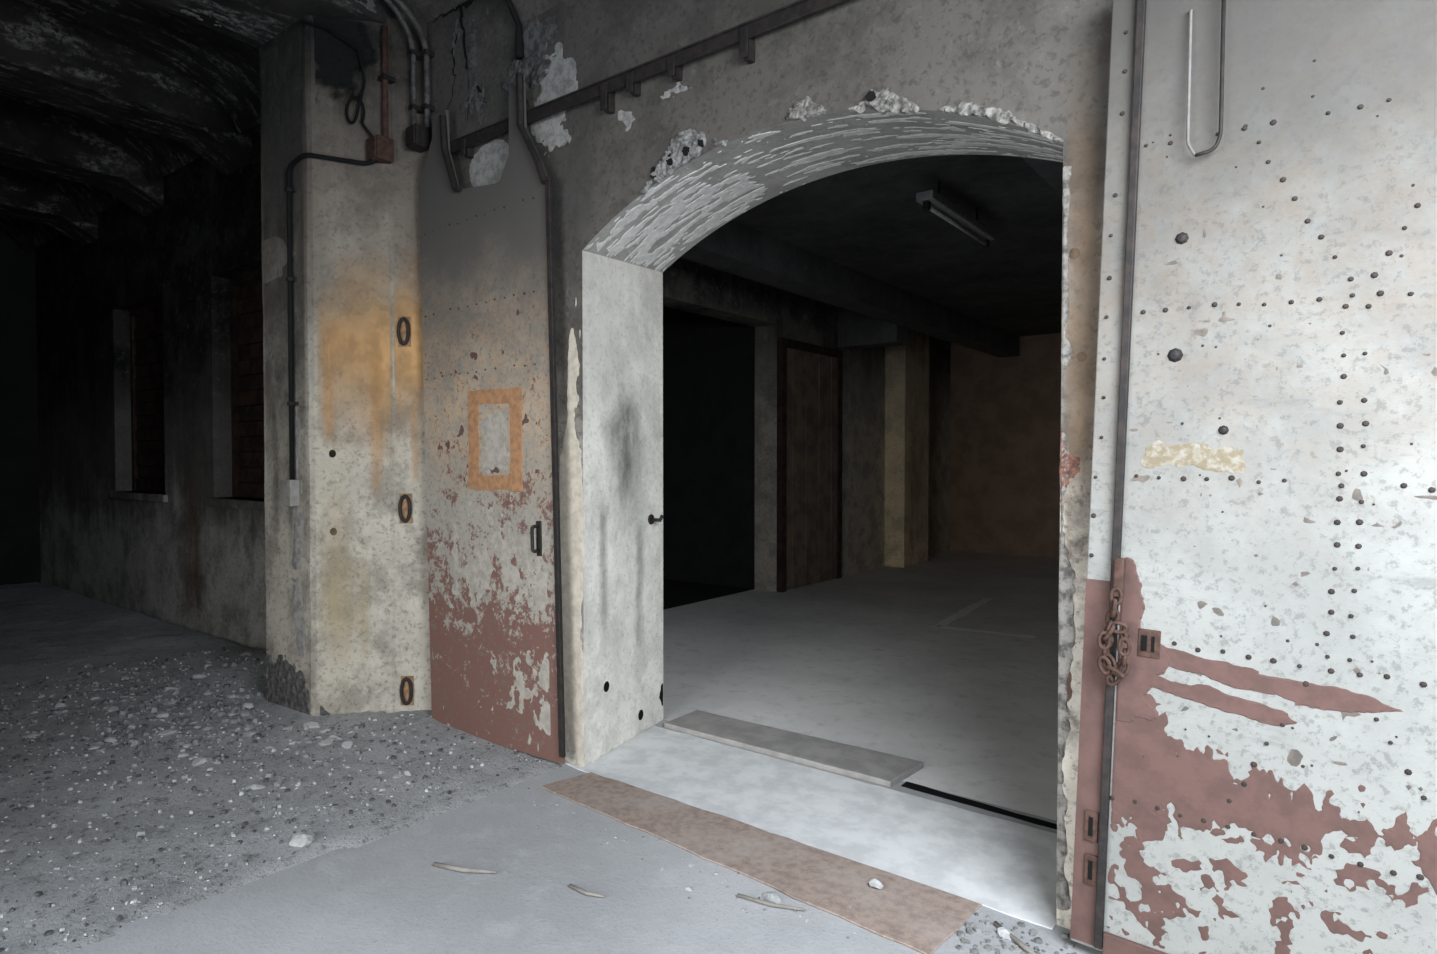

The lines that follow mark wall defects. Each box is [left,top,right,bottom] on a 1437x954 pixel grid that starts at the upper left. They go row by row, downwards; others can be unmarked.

rust [325,296,423,418]
peeling [502,16,578,156]
peeling [660,82,692,99]
peeling [585,87,1073,368]
peeling [1194,311,1235,337]
peeling [433,328,584,767]
spalling [1056,429,1080,910]
peeling [1106,557,1437,954]